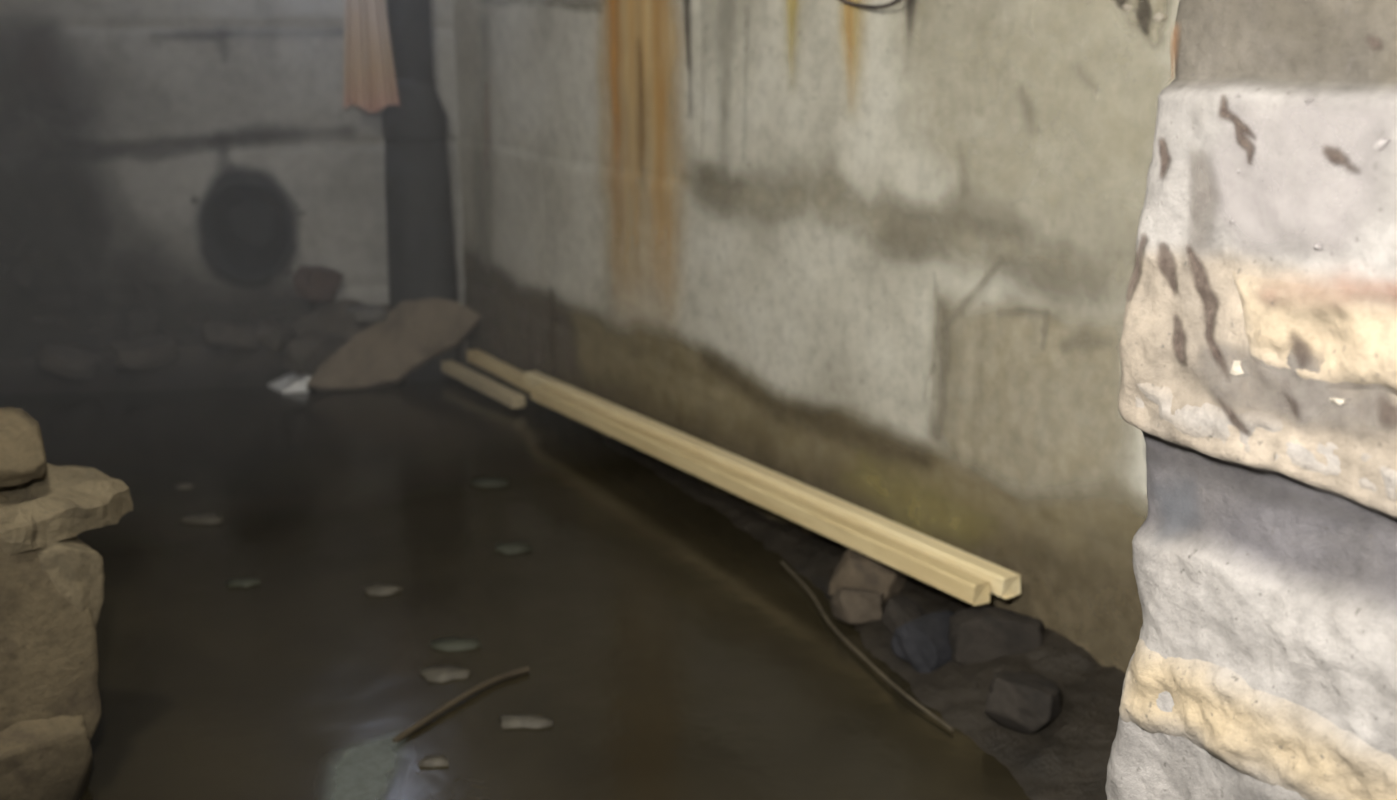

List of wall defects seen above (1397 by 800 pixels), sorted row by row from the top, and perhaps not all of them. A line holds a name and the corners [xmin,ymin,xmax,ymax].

rust [607,0,675,238]
rust [844,0,859,46]
damp [907,0,1161,207]
spalling [1117,0,1169,43]
damp [464,167,1148,674]